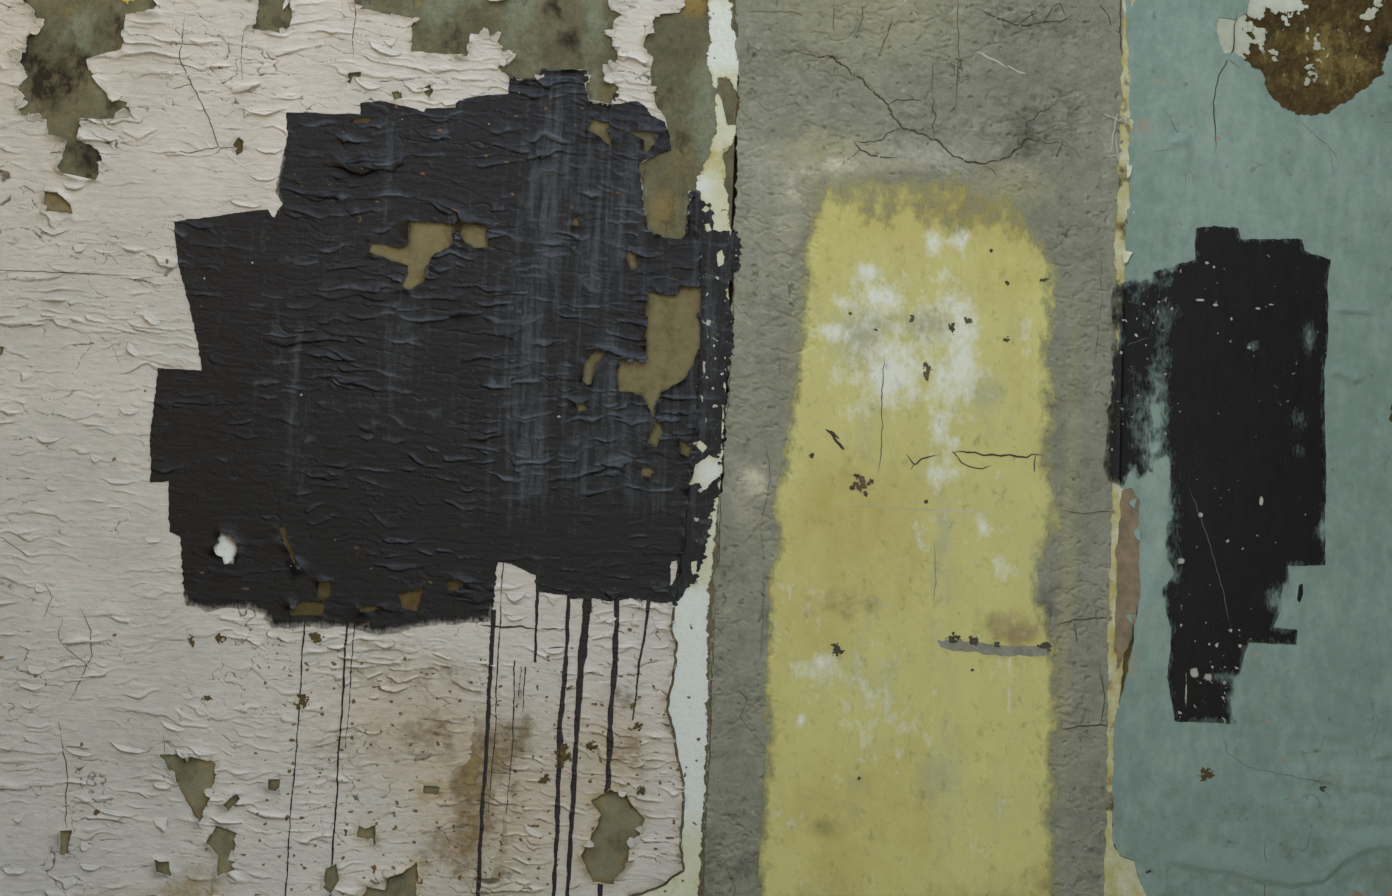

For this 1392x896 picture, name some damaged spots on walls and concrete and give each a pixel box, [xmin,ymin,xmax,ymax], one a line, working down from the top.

peeling [7,0,161,272]
peeling [242,0,297,34]
peeling [345,0,621,106]
peeling [631,0,744,239]
crack [750,0,1122,175]
spalling [1243,0,1392,116]
peeling [368,221,489,289]
peeling [110,742,242,876]
peeling [320,864,339,894]
peeling [357,825,376,845]
peeling [363,862,421,896]
peeling [581,786,646,884]